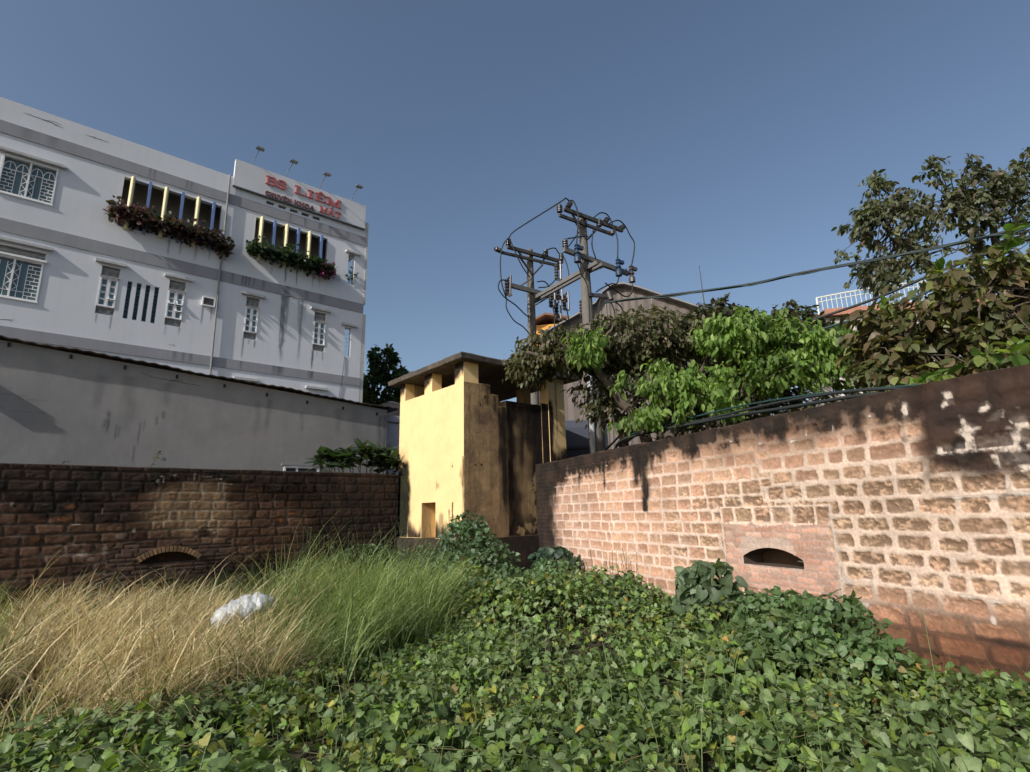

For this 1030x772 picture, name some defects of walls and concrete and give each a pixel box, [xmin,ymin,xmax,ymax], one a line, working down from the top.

leakage [486,364,1030,548]
leakage [0,458,421,594]
leakage [993,638,1026,648]